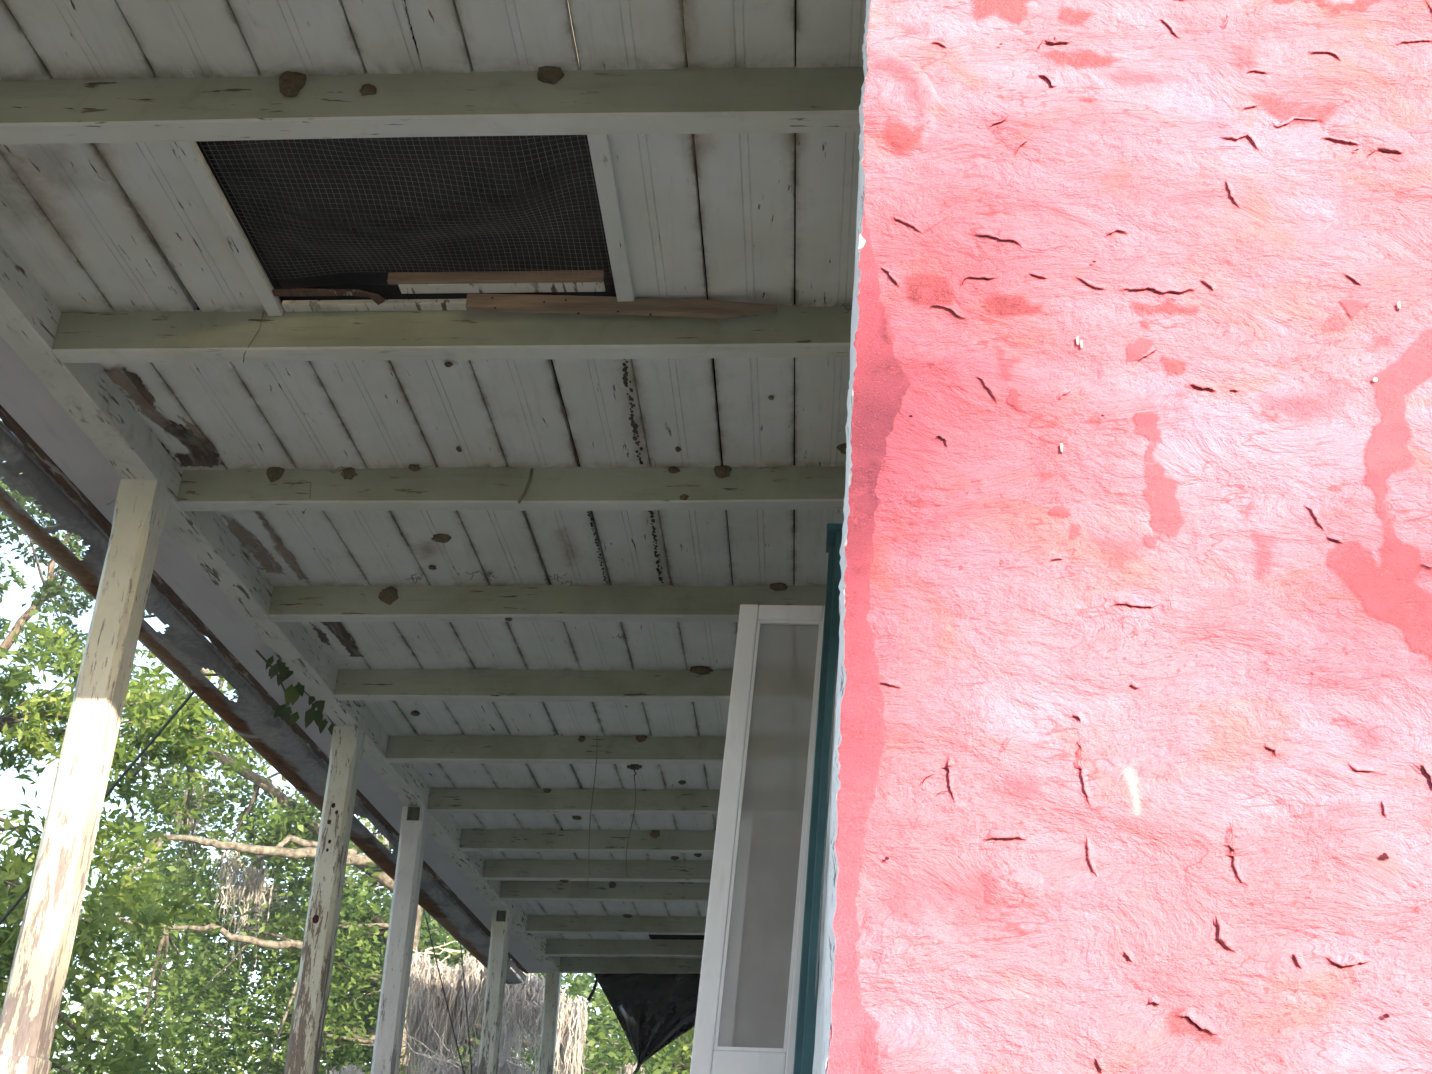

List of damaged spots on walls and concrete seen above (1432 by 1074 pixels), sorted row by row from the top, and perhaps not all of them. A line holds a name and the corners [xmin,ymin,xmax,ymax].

spalling [975,0,1028,23]
spalling [1059,9,1090,24]
spalling [1316,0,1378,11]
peeling [104,368,225,468]
corrosion [80,583,99,597]